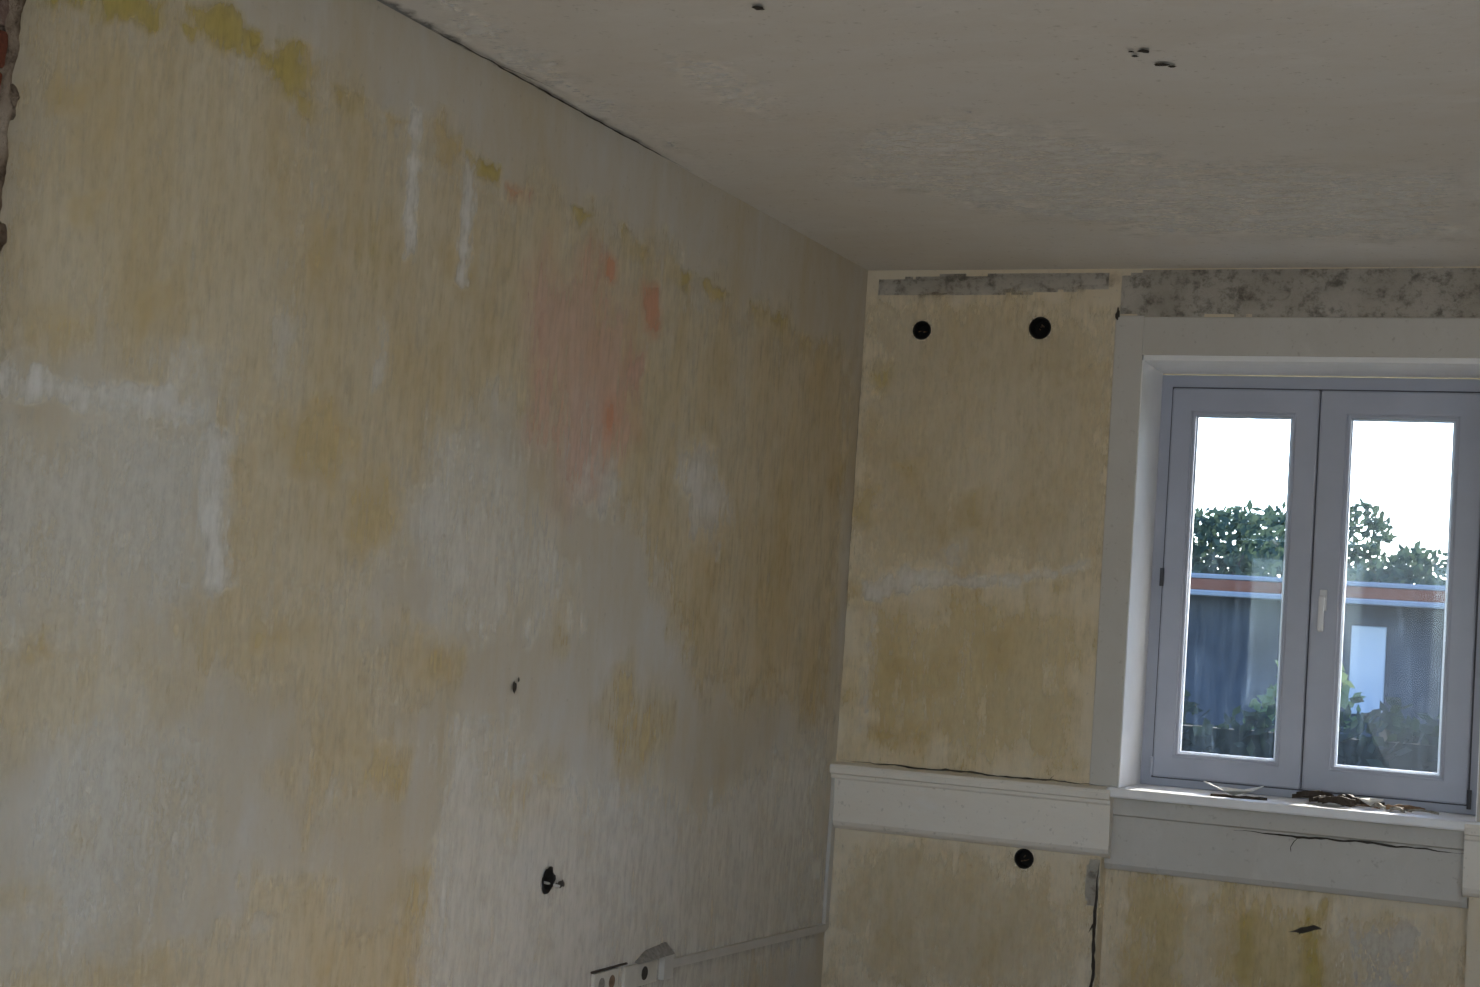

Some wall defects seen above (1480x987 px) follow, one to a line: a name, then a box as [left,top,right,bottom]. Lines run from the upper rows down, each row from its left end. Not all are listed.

flaking render [0,0,26,252]
peeling [182,3,260,56]
peeling [851,268,1480,595]
crack [1235,830,1464,854]